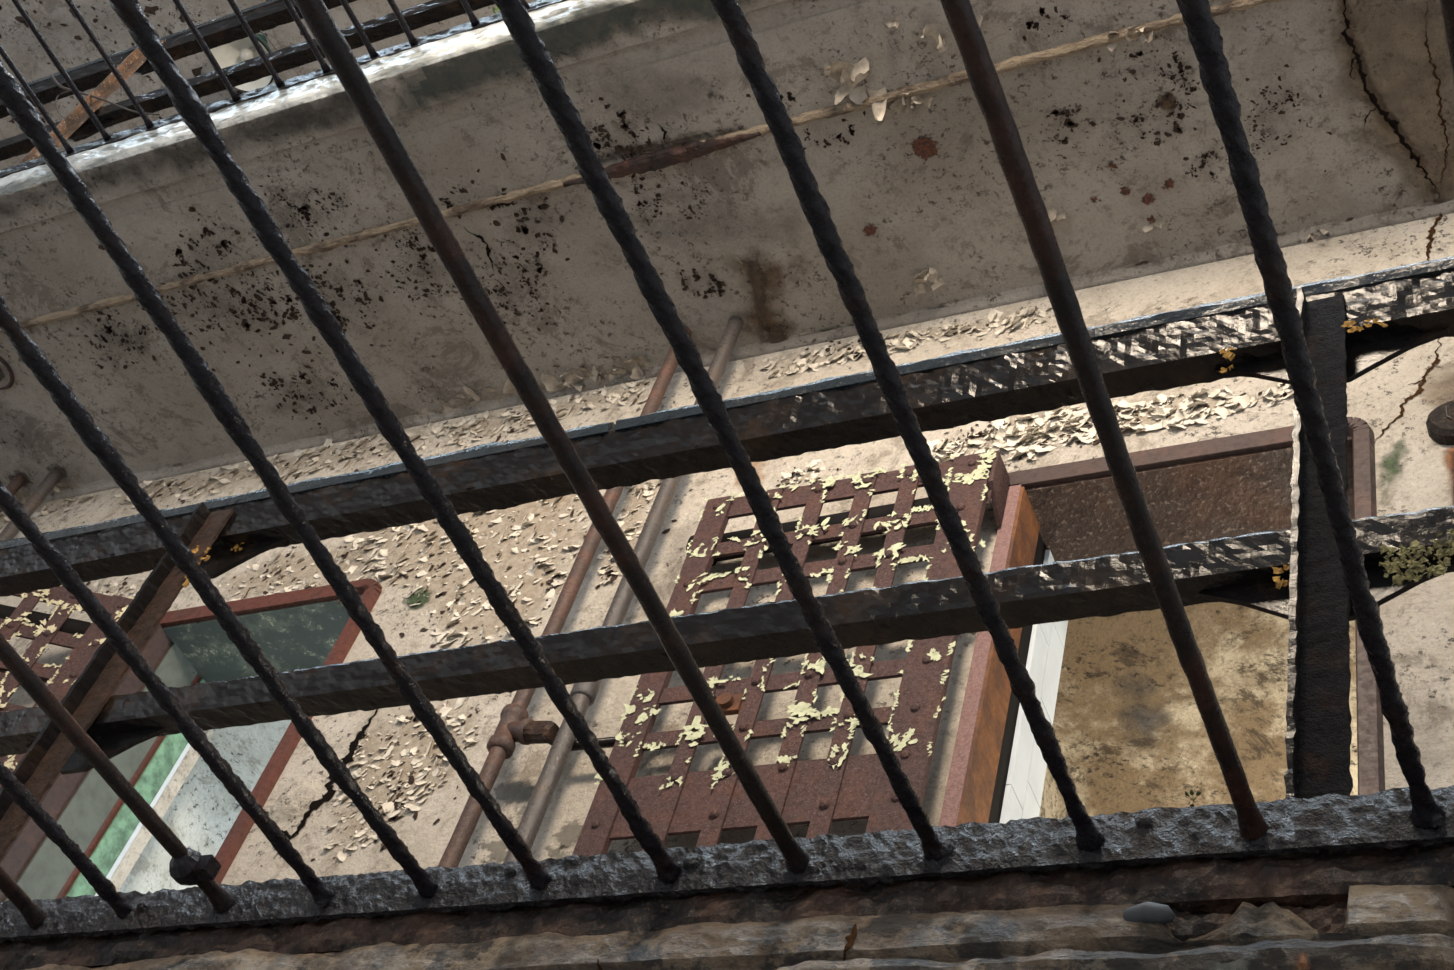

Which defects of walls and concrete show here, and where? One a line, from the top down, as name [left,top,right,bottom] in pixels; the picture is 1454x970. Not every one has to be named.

crack [1341,0,1449,261]
leakage [739,254,791,344]
crack [1374,338,1442,444]
rust [1445,447,1454,491]
peeling [667,518,768,617]
peeling [766,459,951,593]
crack [281,709,378,840]
peeling [615,684,715,790]
peeling [776,653,859,769]
peeling [845,652,874,678]
peeling [886,670,933,756]
peeling [905,640,956,718]